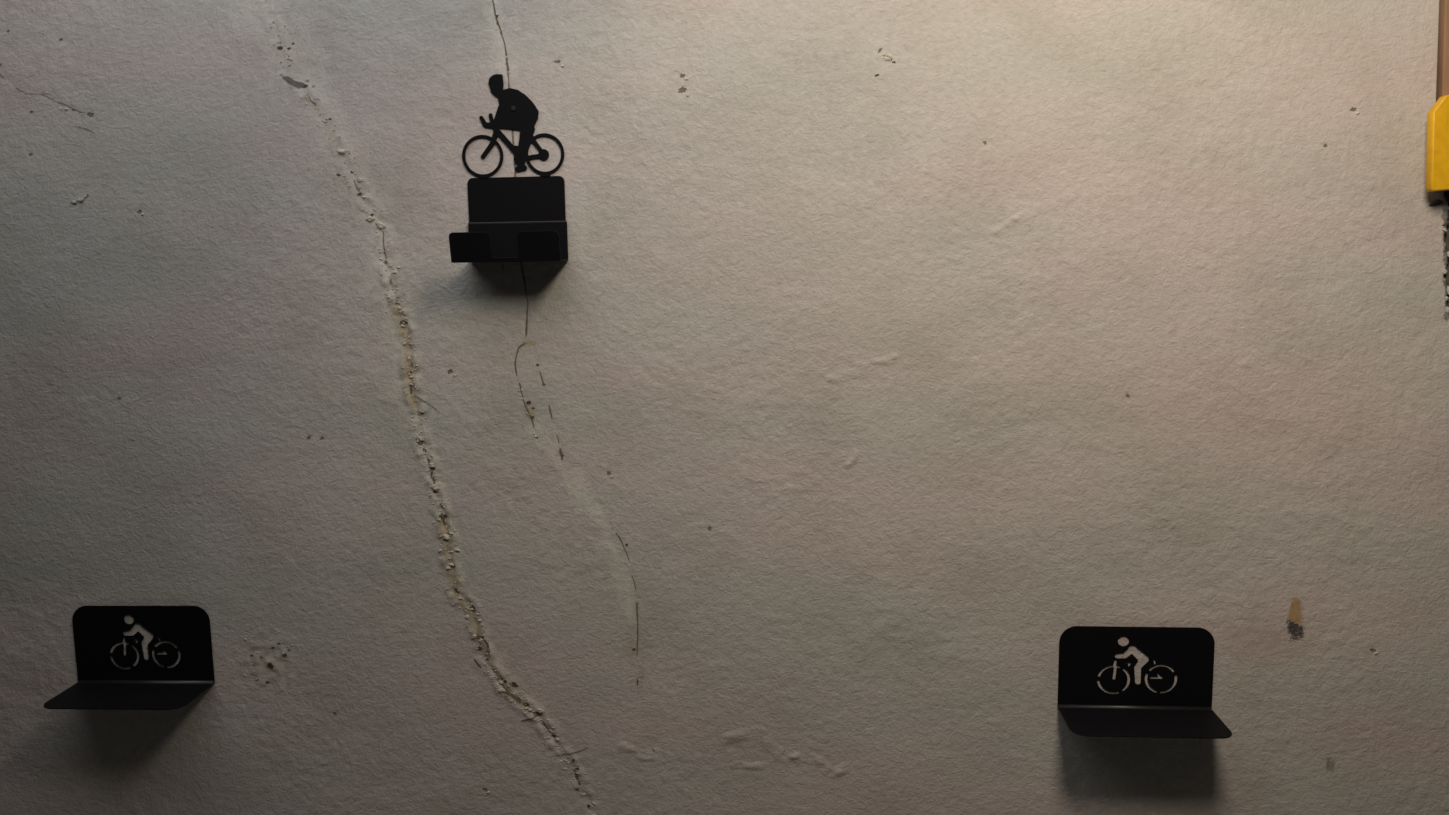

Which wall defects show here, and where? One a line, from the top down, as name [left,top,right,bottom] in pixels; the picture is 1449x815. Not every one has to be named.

crack [180,0,596,815]
crack [502,262,642,685]